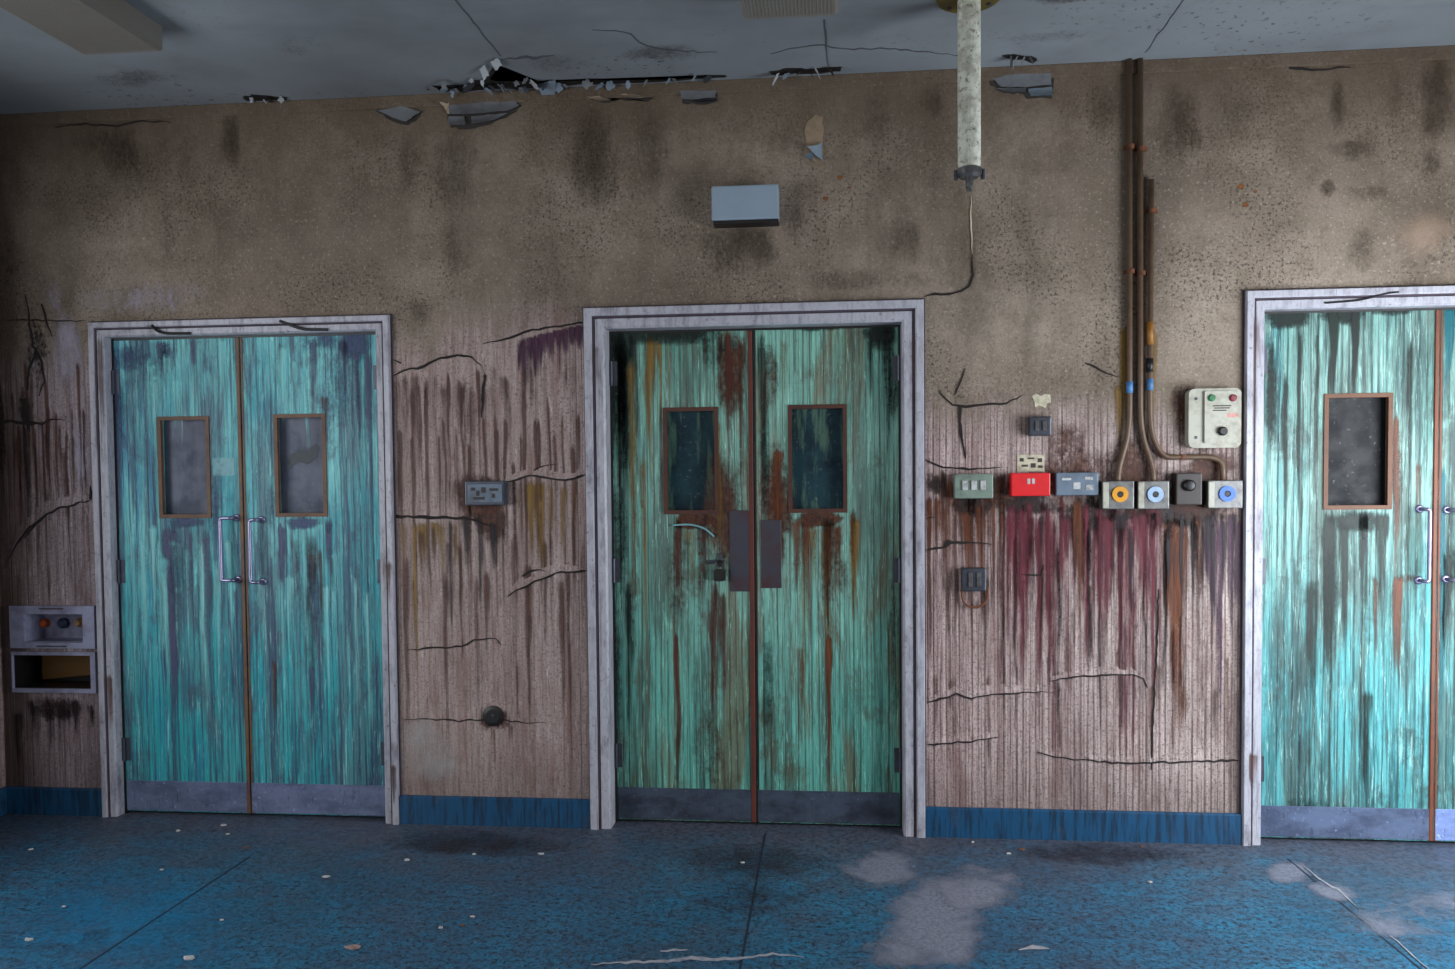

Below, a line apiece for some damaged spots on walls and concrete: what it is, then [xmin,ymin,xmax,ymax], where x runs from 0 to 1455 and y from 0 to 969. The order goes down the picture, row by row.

peeling [375,106,422,125]
peeling [427,58,726,130]
crack [0,294,83,431]
crack [505,460,585,482]
crack [5,482,92,569]
crack [396,515,495,527]
crack [507,556,586,597]
rust [669,333,745,777]
rust [926,327,1236,748]
crack [409,638,501,650]
rust [761,449,856,781]
water stain [15,699,93,761]